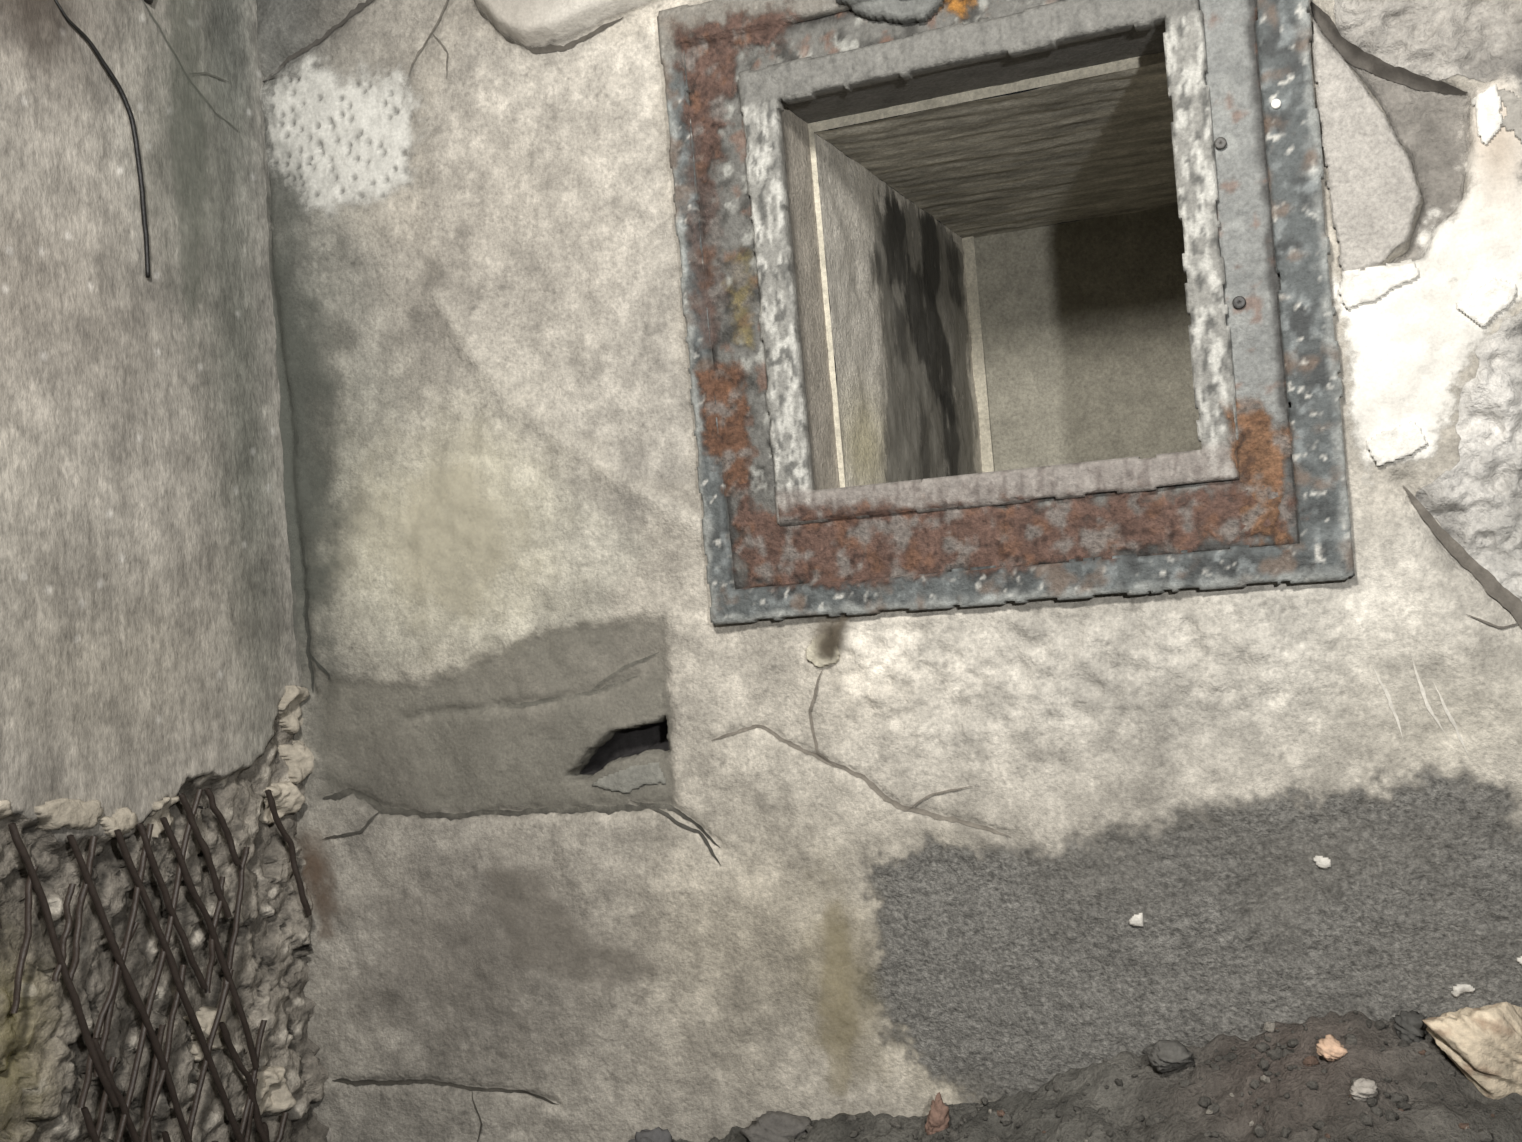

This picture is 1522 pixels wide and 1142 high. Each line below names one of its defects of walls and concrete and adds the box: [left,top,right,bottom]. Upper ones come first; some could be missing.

crack [142,0,374,131]
crack [403,0,449,93]
rust [944,0,975,17]
crack [270,215,281,301]
leakage [873,185,978,483]
rust [674,7,1296,590]
flaking render [1310,0,1522,601]
crack [1402,485,1522,629]
crack [302,589,331,692]
spalling [580,720,670,793]
crack [711,669,1011,838]
spalling [0,685,329,1142]